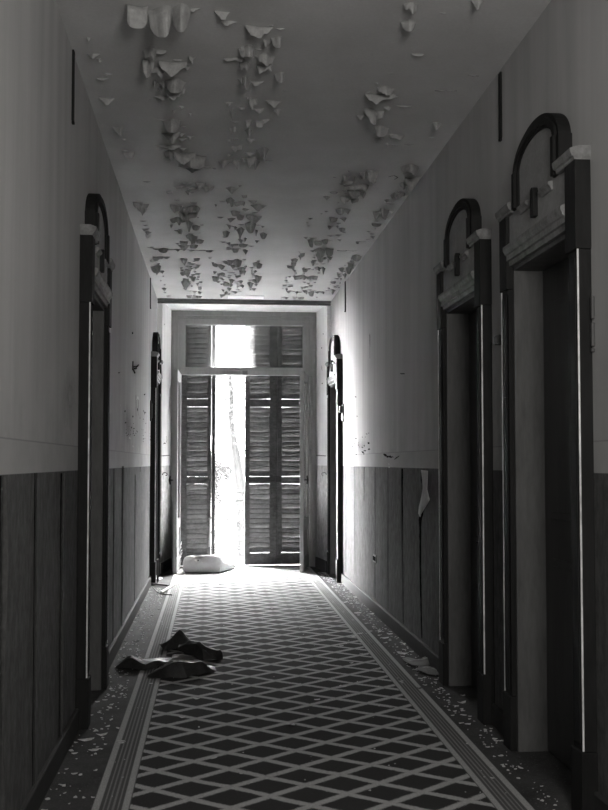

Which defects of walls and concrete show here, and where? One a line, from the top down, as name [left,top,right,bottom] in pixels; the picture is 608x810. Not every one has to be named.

peeling [126,3,200,38]
peeling [401,2,418,31]
peeling [356,83,414,146]
peeling [133,11,286,298]
peeling [281,170,379,300]